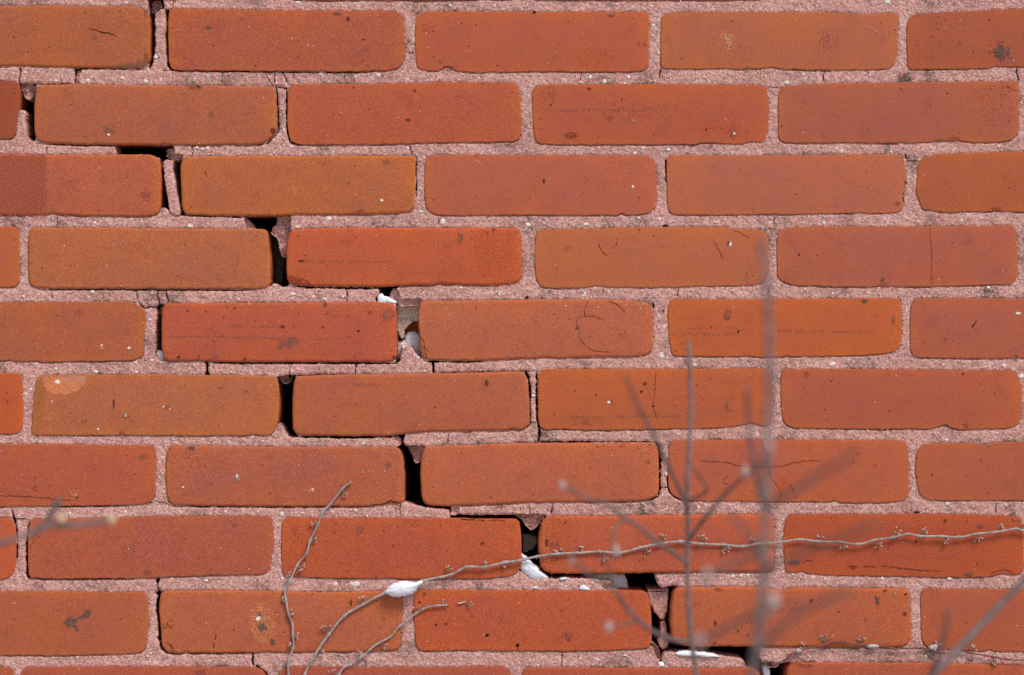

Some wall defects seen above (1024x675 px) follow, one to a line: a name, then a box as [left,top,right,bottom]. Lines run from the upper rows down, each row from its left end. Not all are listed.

crack [39,289,250,350]
crack [283,262,398,314]
crack [576,288,624,352]
crack [419,335,493,373]
crack [206,360,596,575]
crack [512,371,679,500]
crack [156,577,268,675]